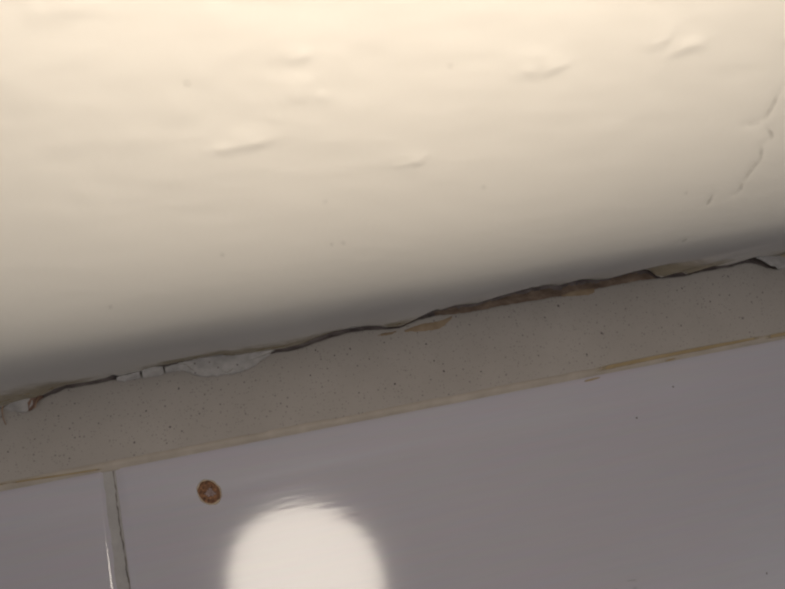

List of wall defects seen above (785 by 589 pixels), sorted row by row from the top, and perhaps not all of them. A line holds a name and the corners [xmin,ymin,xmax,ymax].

spalling [378,272,655,336]
peeling [178,350,275,377]
rust [197,480,222,505]